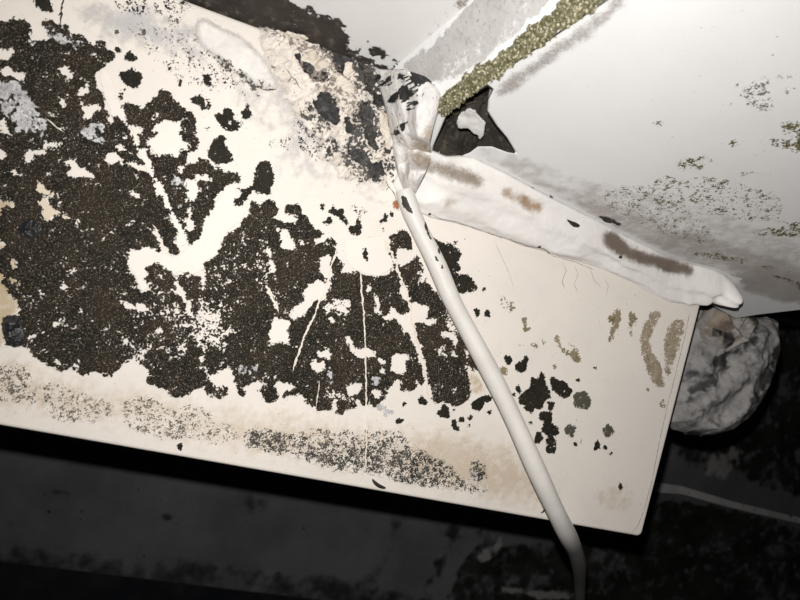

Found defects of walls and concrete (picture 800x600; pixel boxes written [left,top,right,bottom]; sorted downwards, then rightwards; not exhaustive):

spalling [259,28,395,184]
spalling [432,85,515,156]
water stain [0,0,492,494]
water stain [504,355,591,454]
water stain [594,423,615,455]